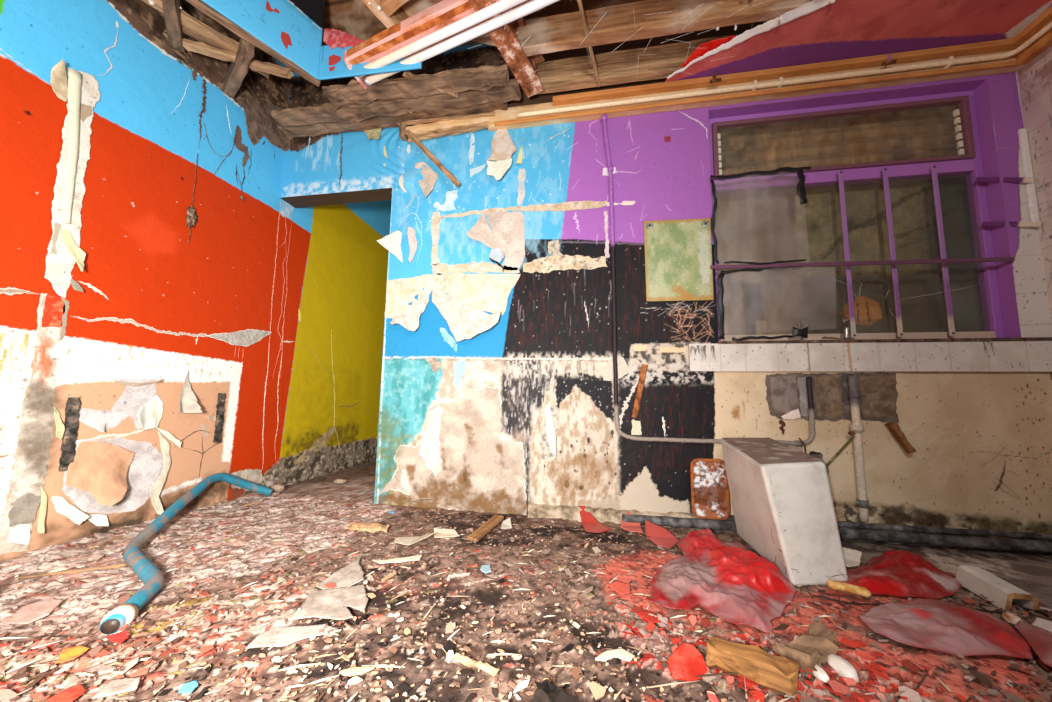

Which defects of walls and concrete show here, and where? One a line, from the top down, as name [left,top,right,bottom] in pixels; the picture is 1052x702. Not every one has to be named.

peeling [281,31,292,49]
peeling [323,28,363,71]
spalling [234,97,291,167]
flaking render [407,133,635,274]
crack [0,287,38,295]
peeling [601,356,630,381]
flaking render [0,293,69,555]
spalling [380,327,527,515]
peeling [539,374,559,461]
water stain [882,508,949,526]